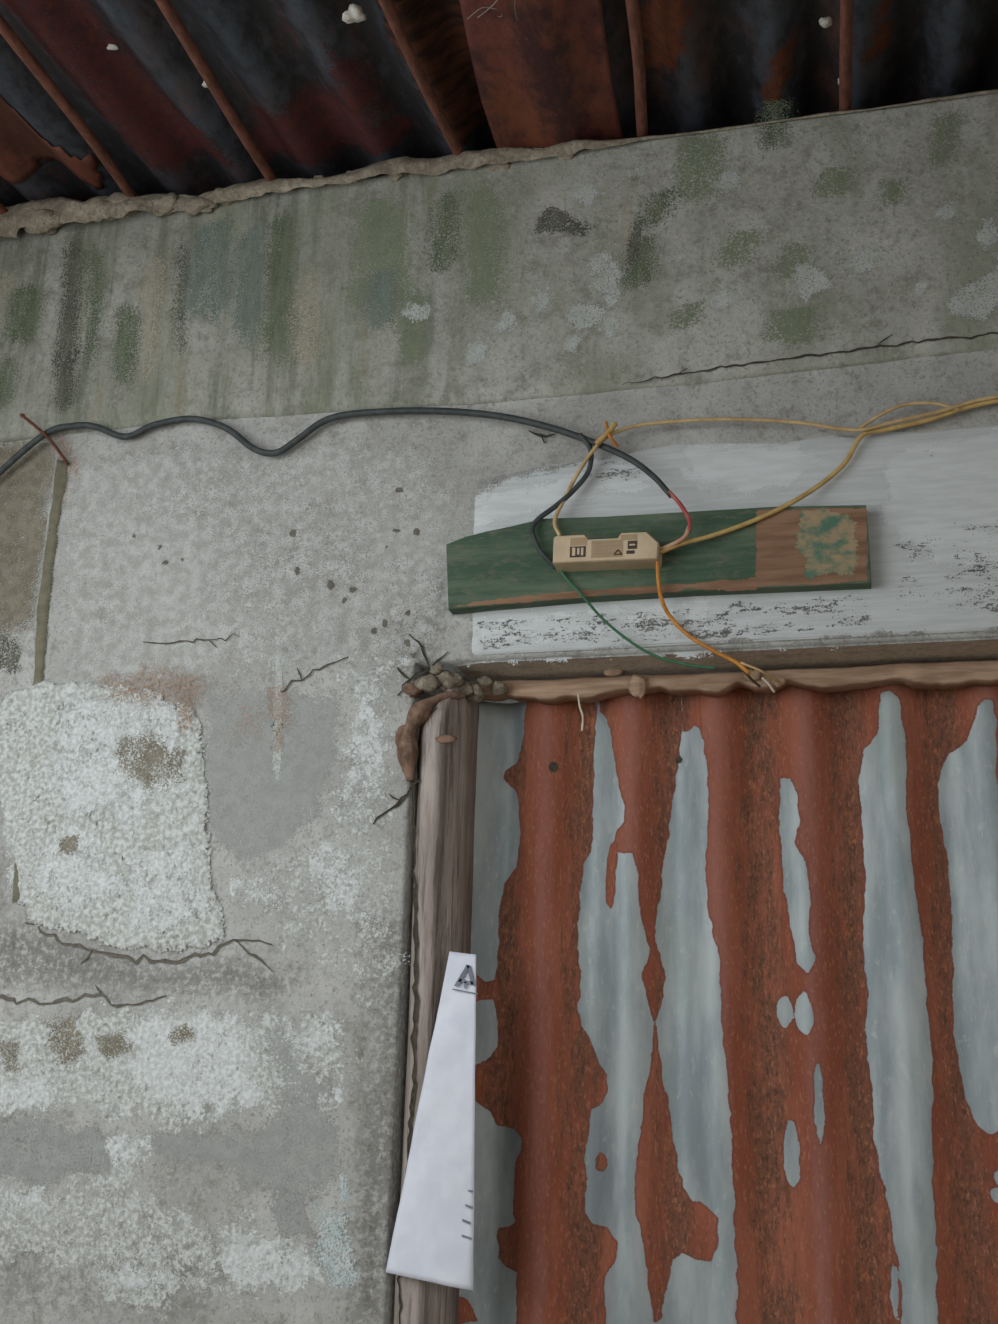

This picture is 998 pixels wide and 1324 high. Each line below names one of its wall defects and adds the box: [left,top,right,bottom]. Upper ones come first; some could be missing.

corrosion [375,0,487,147]
water stain [0,183,518,414]
water stain [527,97,798,355]
water stain [709,227,879,345]
crack [622,332,998,385]
water stain [811,165,912,206]
peeling [0,425,998,1324]
crack [0,922,273,1008]
corrosion [475,684,998,1324]
corrosion [458,1296,477,1324]